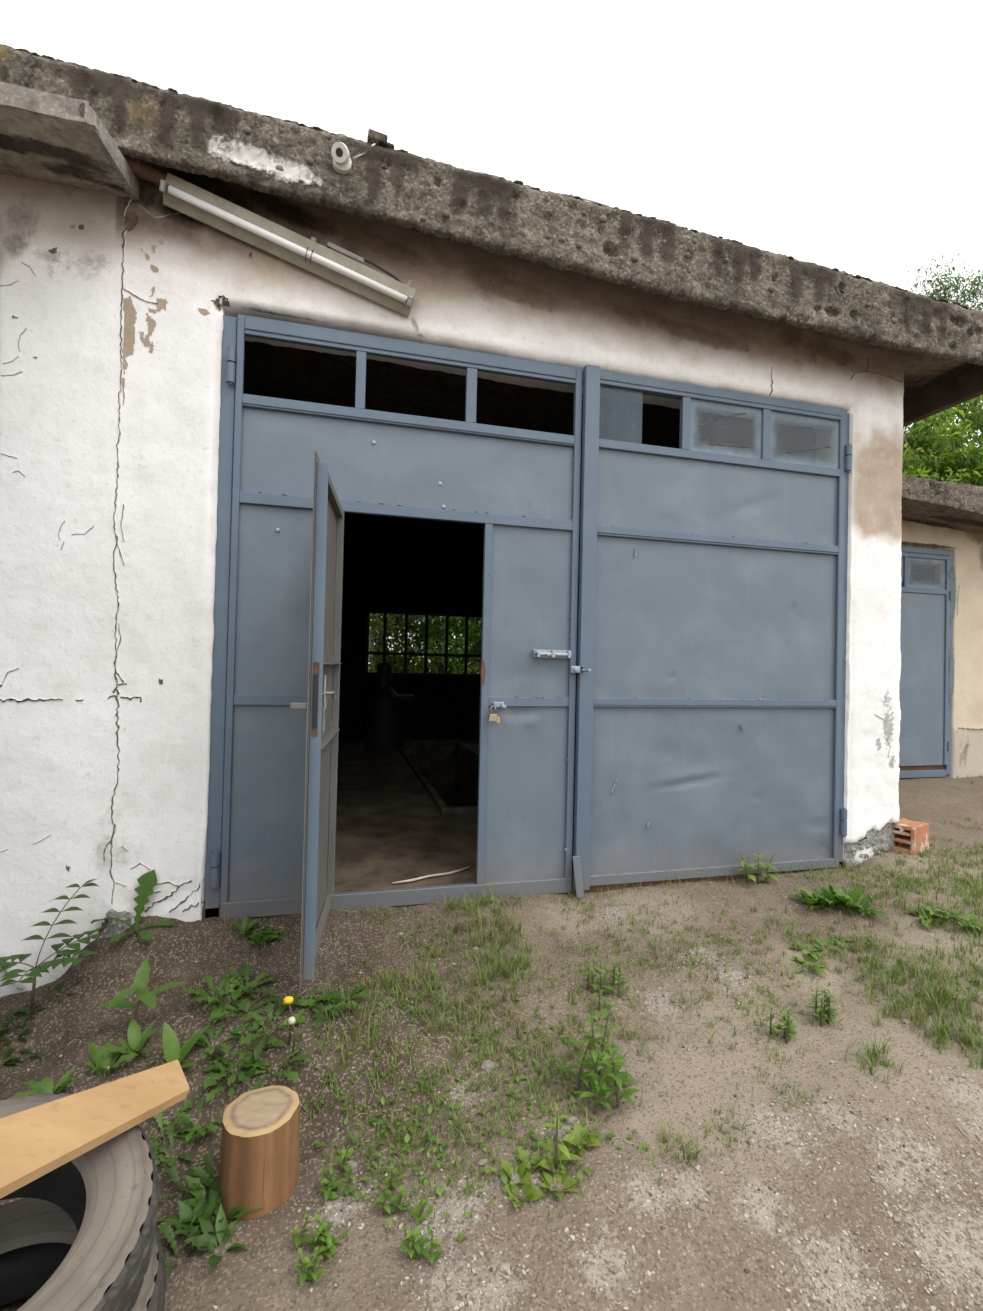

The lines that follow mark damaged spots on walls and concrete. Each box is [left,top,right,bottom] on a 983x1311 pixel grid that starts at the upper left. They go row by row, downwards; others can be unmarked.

leakage [446,168,513,220]
peeling [121,239,168,388]
leakage [478,275,554,307]
leakage [621,210,676,262]
leakage [664,323,732,347]
leakage [705,234,761,281]
leakage [785,260,837,300]
leakage [906,295,950,331]
crack [0,197,204,913]
spalling [844,822,899,868]